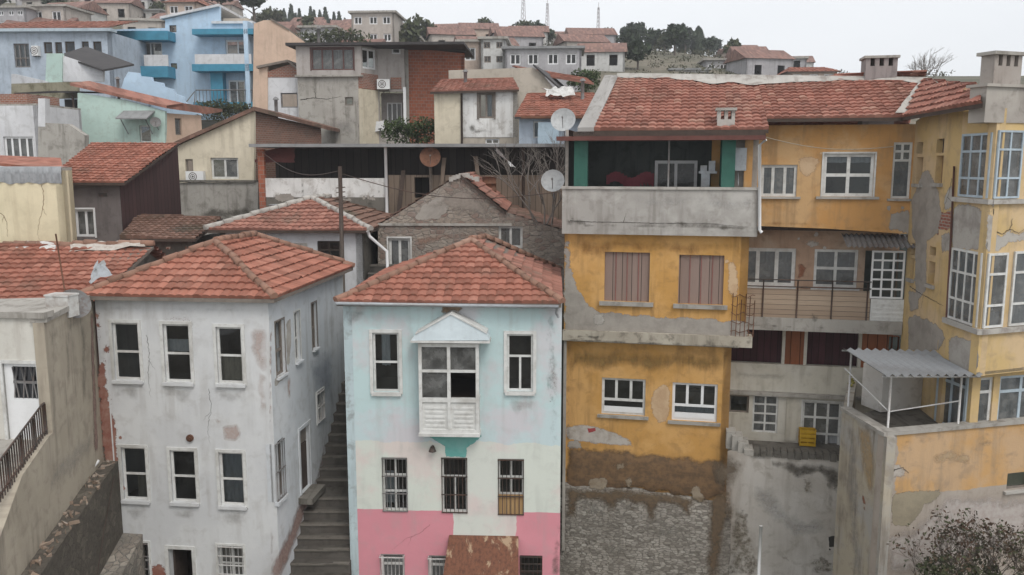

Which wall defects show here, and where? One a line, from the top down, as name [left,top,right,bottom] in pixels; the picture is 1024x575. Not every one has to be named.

flaking render [29,346,122,575]
flaking render [566,425,631,449]